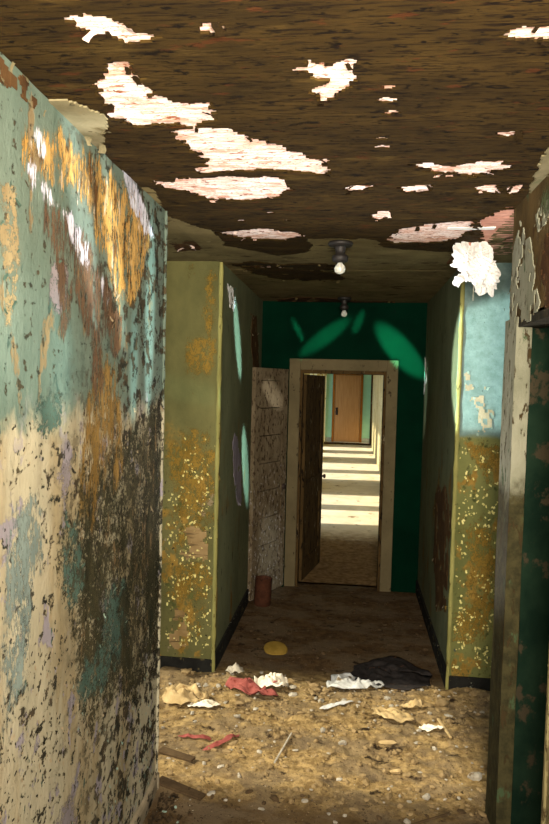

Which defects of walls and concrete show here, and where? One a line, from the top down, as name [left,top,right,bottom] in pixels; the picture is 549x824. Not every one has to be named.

flaking render [64,13,154,43]
flaking render [200,22,225,37]
flaking render [504,26,549,46]
flaking render [292,59,357,104]
flaking render [0,56,332,203]
flaking render [498,130,523,141]
flaking render [401,161,511,194]
flaking render [387,221,484,245]
peeling [534,202,549,232]
peeling [464,371,494,436]
damp [27,126,165,740]
damp [0,493,44,737]